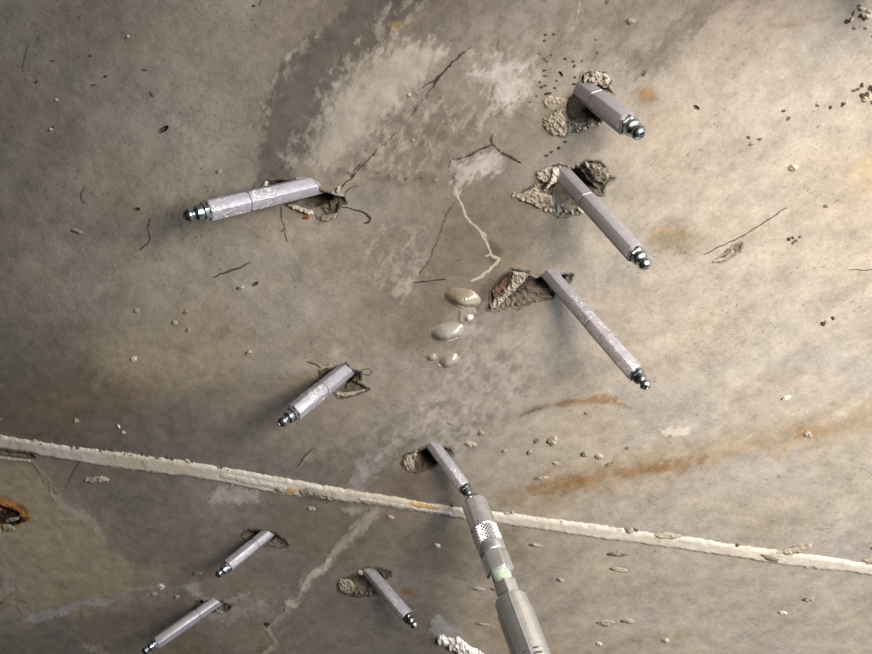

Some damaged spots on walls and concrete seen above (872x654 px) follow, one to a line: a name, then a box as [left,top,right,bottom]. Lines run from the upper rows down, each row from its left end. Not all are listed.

water stain [259,0,416,182]
water stain [470,52,530,114]
spalling [579,69,616,96]
crack [340,40,524,224]
spalling [542,92,603,139]
crack [412,133,521,283]
water stain [449,153,503,195]
spalling [509,158,617,218]
spalling [485,267,557,313]
spalling [310,362,370,399]
spalling [400,446,438,474]
rust [0,498,31,532]